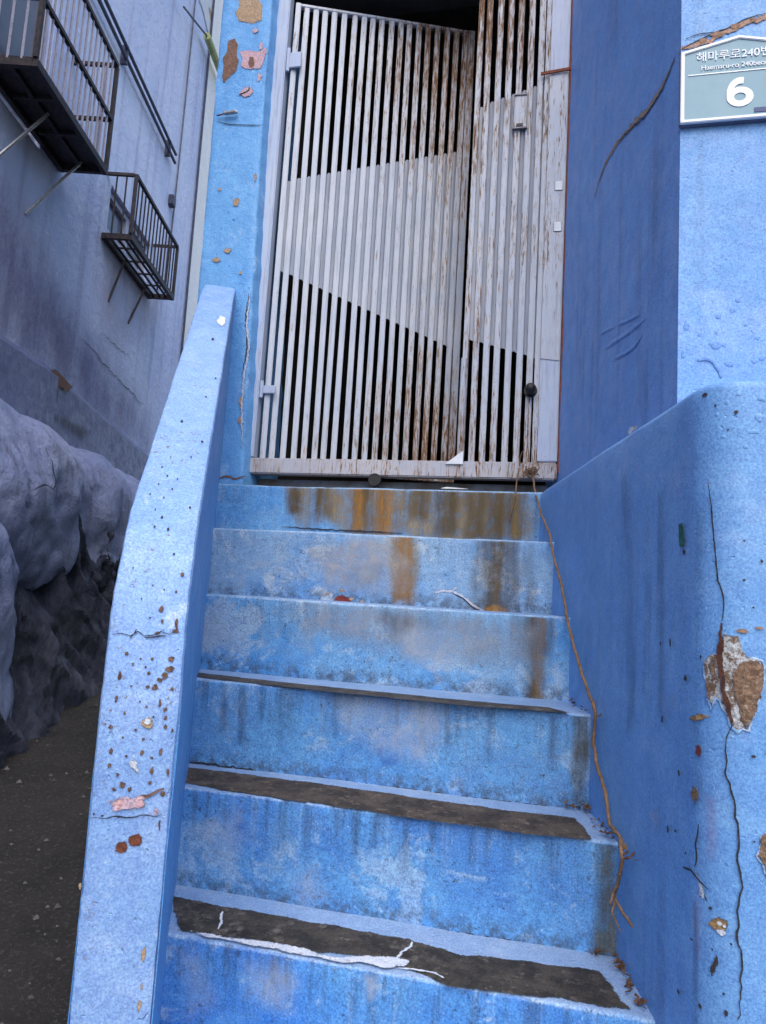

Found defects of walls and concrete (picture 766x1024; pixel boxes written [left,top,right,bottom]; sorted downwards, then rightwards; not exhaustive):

peeling [221,0,267,97]
crack [594,13,766,197]
rust [288,487,531,612]
crack [708,483,724,620]
peeling [108,652,175,797]
crack [112,628,178,638]
spalling [689,623,766,734]
crack [724,723,744,1020]